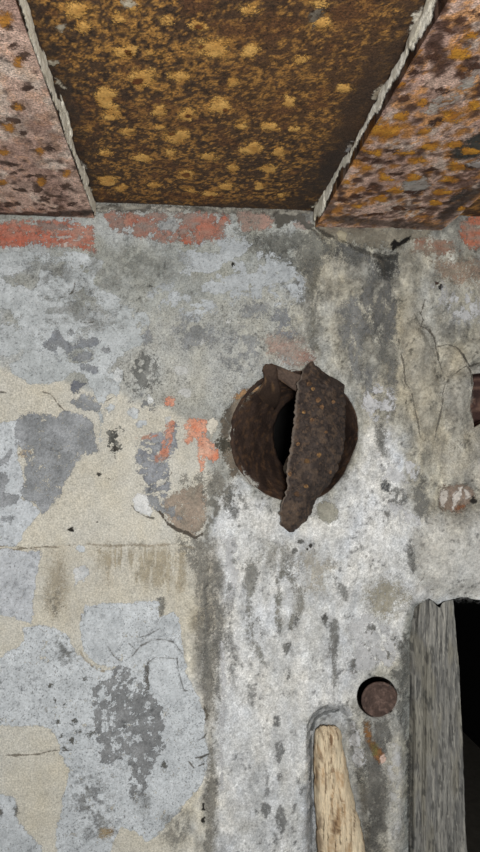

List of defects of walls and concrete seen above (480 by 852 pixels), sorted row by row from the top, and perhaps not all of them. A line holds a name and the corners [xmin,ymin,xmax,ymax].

rust [0,150,81,217]
rust [62,1,92,33]
rust [94,86,122,121]
rust [150,105,196,156]
rust [187,20,230,60]
rust [337,100,480,217]
rust [372,9,480,138]
crack [398,304,478,435]
peeling [0,203,480,852]
damp [260,544,332,630]
damp [299,580,414,852]
damp [256,803,296,834]